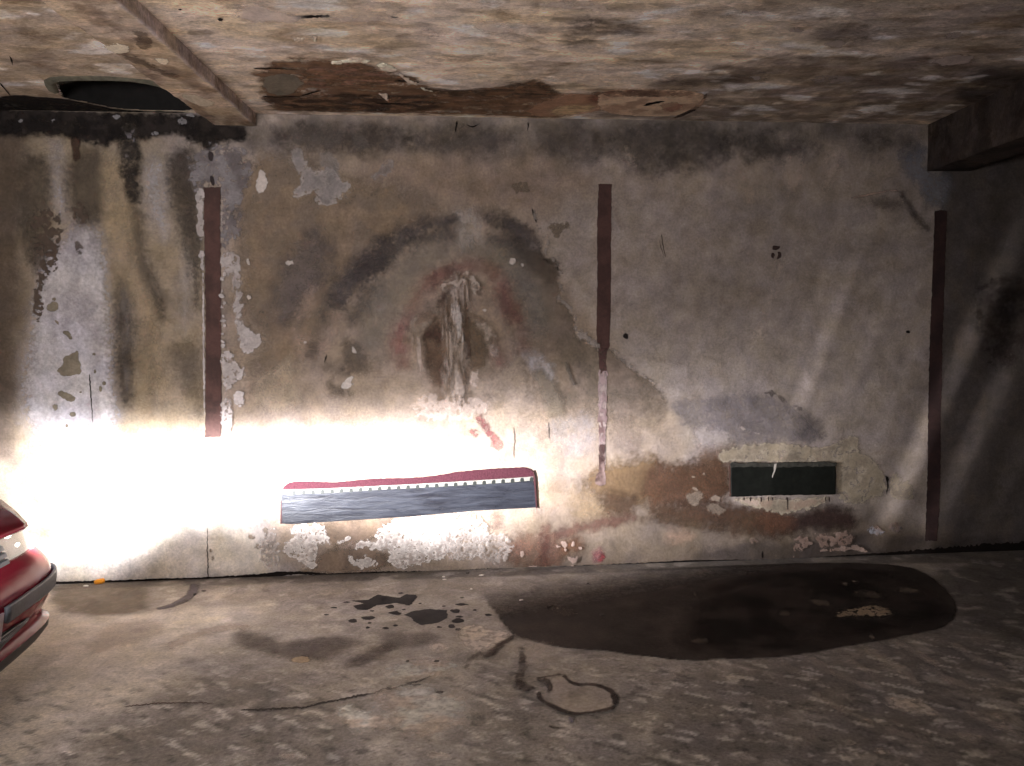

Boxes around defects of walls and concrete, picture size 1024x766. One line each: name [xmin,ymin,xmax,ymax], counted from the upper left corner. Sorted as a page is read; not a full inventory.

peeling [331,57,433,92]
spalling [597,89,707,118]
peeling [290,146,351,206]
damp [20,114,162,439]
damp [167,142,665,436]
peeling [46,297,72,339]
peeling [57,351,81,376]
peeling [53,391,82,428]
peeling [719,436,887,515]
peeling [248,513,491,570]
rust [771,506,856,532]
damp [489,563,957,660]